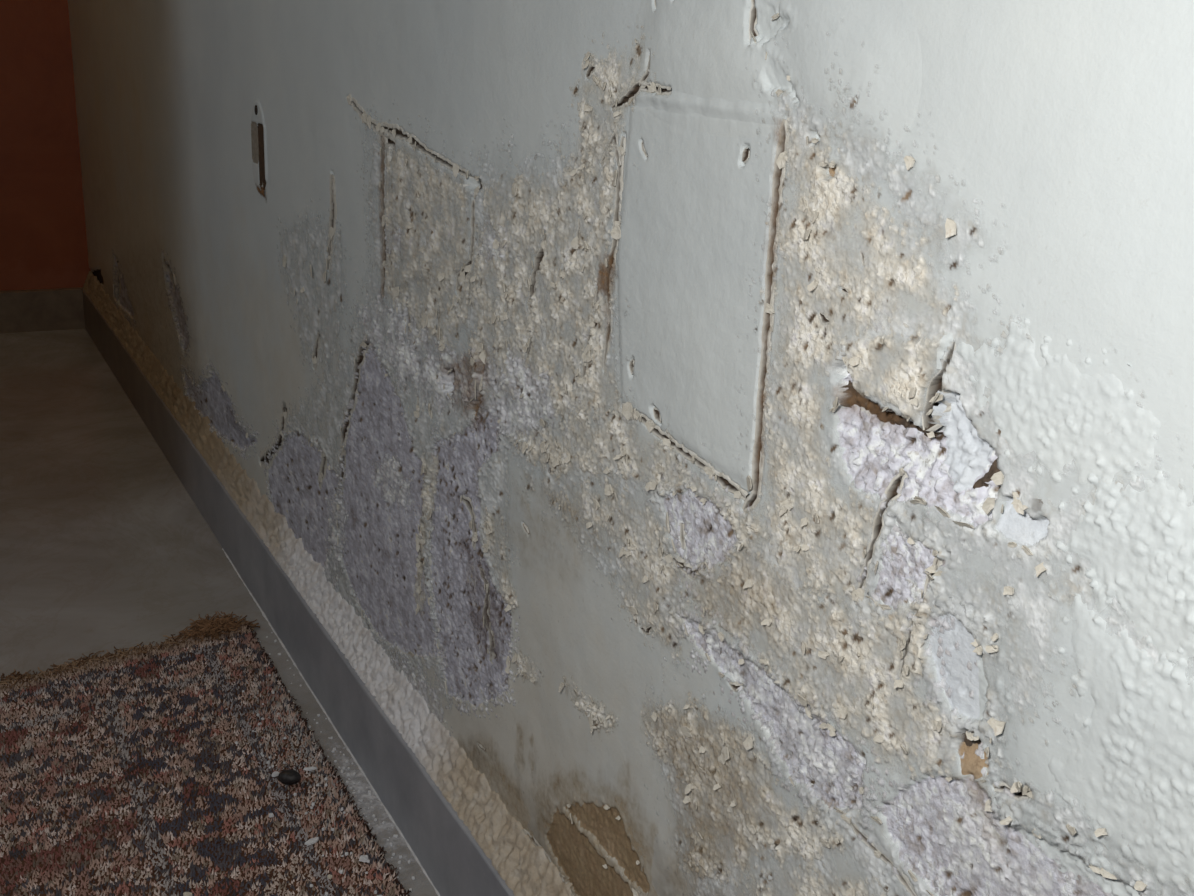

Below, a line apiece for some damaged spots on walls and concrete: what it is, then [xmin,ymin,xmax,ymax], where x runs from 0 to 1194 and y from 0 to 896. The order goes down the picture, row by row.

crack [346,94,580,338]
crack [577,55,672,384]
crack [621,119,790,514]
spalling [819,162,836,177]
crack [851,468,908,606]
crack [922,342,955,431]
spalling [829,356,1049,555]
peeling [643,453,1117,896]
peeling [547,802,650,896]